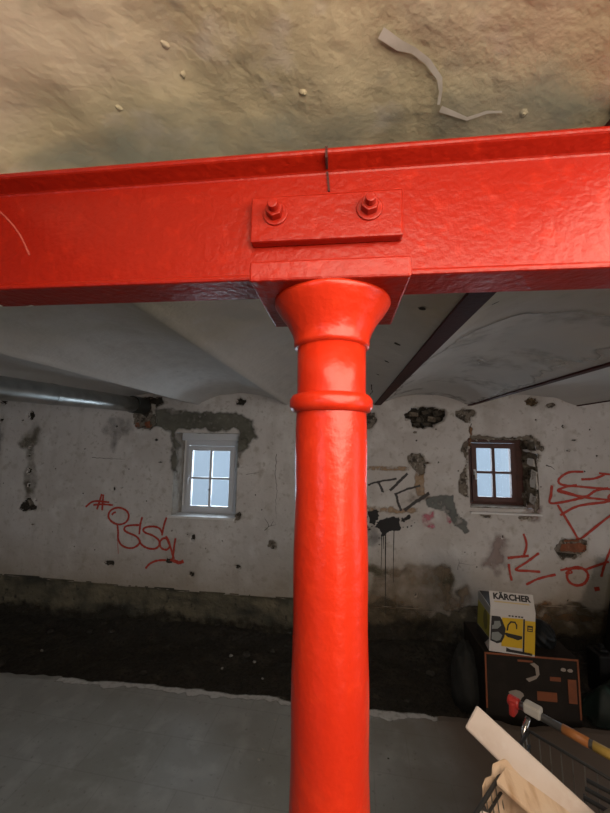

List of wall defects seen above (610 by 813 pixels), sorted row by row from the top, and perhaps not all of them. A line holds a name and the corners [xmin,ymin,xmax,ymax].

water stain [107,137,153,164]
spalling [132,394,169,431]
spalling [404,407,445,441]
spalling [367,453,439,496]
spalling [458,434,544,522]
spalling [550,537,591,560]
water stain [368,565,461,622]